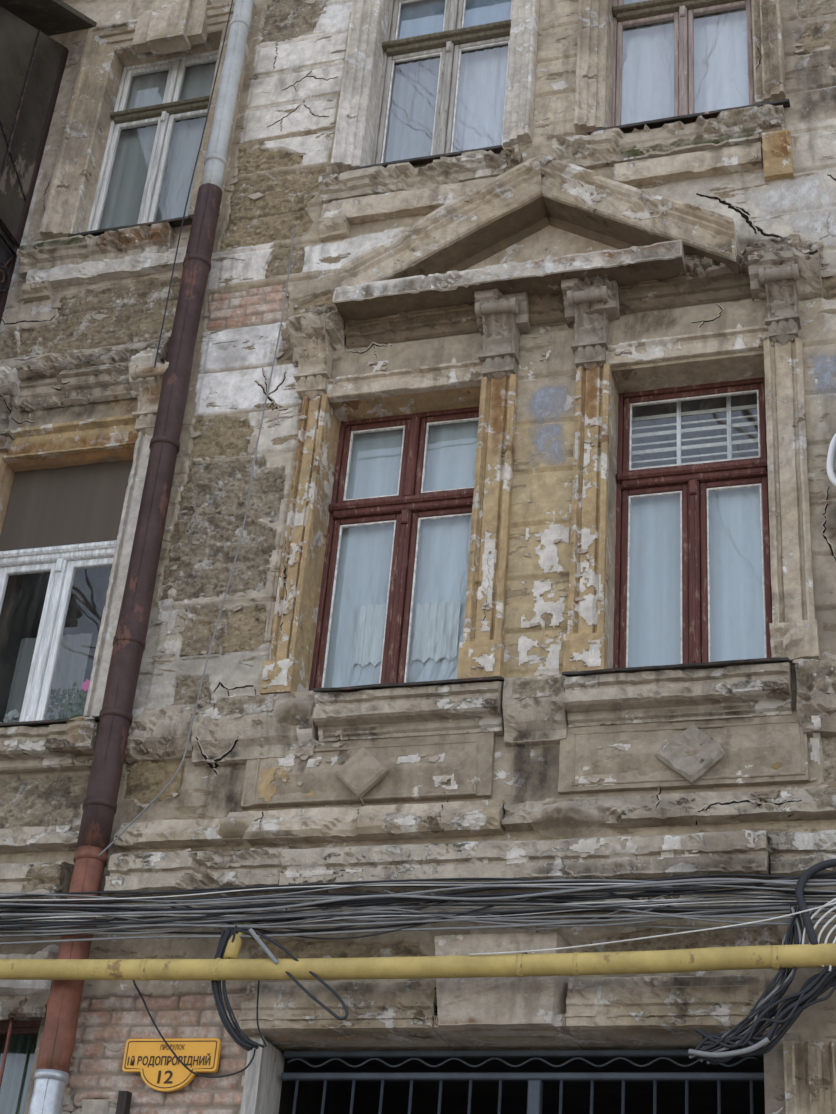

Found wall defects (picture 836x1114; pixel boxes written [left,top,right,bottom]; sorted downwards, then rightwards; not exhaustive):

spalling [261,0,329,43]
spalling [791,0,836,55]
spalling [204,145,353,361]
crack [696,192,783,238]
crack [819,212,836,240]
spalling [0,277,181,360]
peeling [572,397,602,467]
peeling [572,479,599,498]
spalling [155,410,311,719]
peeling [482,529,498,611]
peeling [512,524,604,701]
peeling [468,649,495,672]